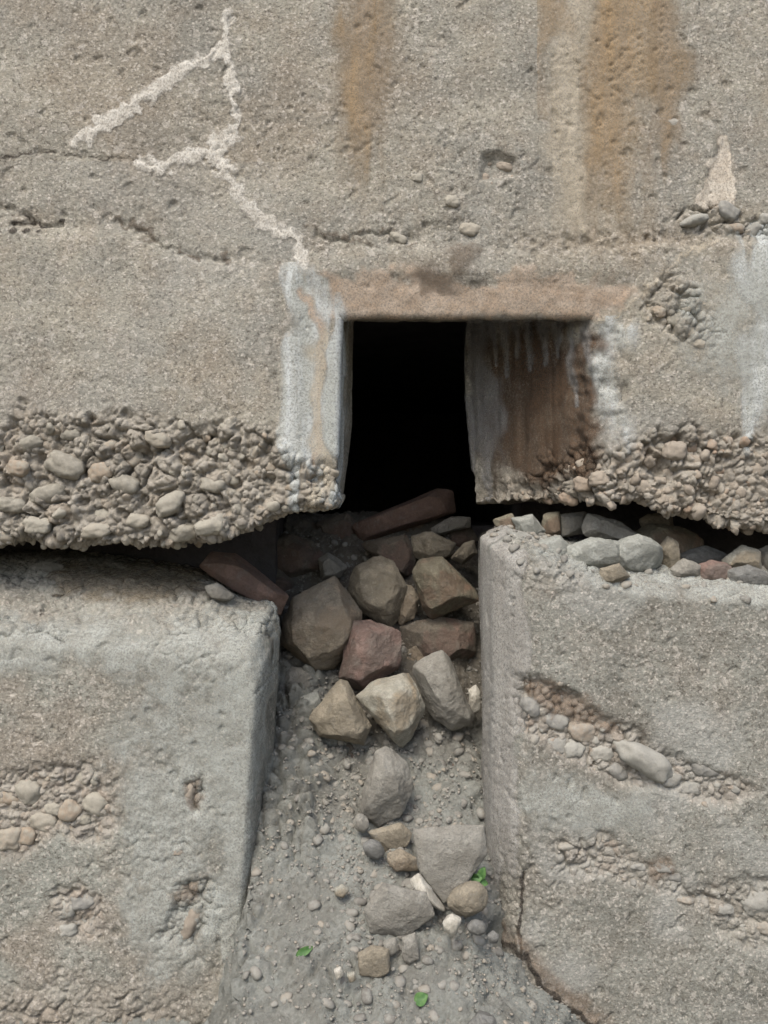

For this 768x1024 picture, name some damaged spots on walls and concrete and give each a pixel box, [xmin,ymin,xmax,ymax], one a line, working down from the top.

crack [1,9,416,271]
spalling [679,135,768,237]
leakage [277,262,351,513]
spalling [0,414,345,615]
spalling [513,436,768,536]
spalling [0,766,112,856]
spalling [508,672,764,807]
crack [501,872,593,1024]